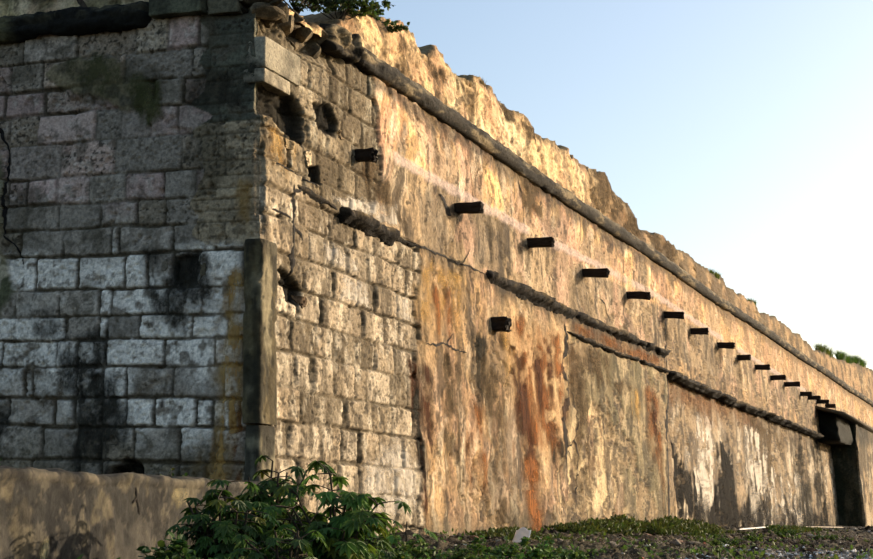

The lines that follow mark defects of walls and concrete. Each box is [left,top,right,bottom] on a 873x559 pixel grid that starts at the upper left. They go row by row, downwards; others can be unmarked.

crack [0,128,24,265]
spalling [115,462,144,474]
water stain [150,254,211,328]
spalling [161,254,206,285]
corrosion [210,269,244,480]
crack [271,159,319,276]
corrosion [422,269,460,333]
crack [427,334,467,353]
corrosion [505,316,564,531]
crack [560,318,579,495]
corrosion [635,387,665,481]
water stain [671,416,829,528]